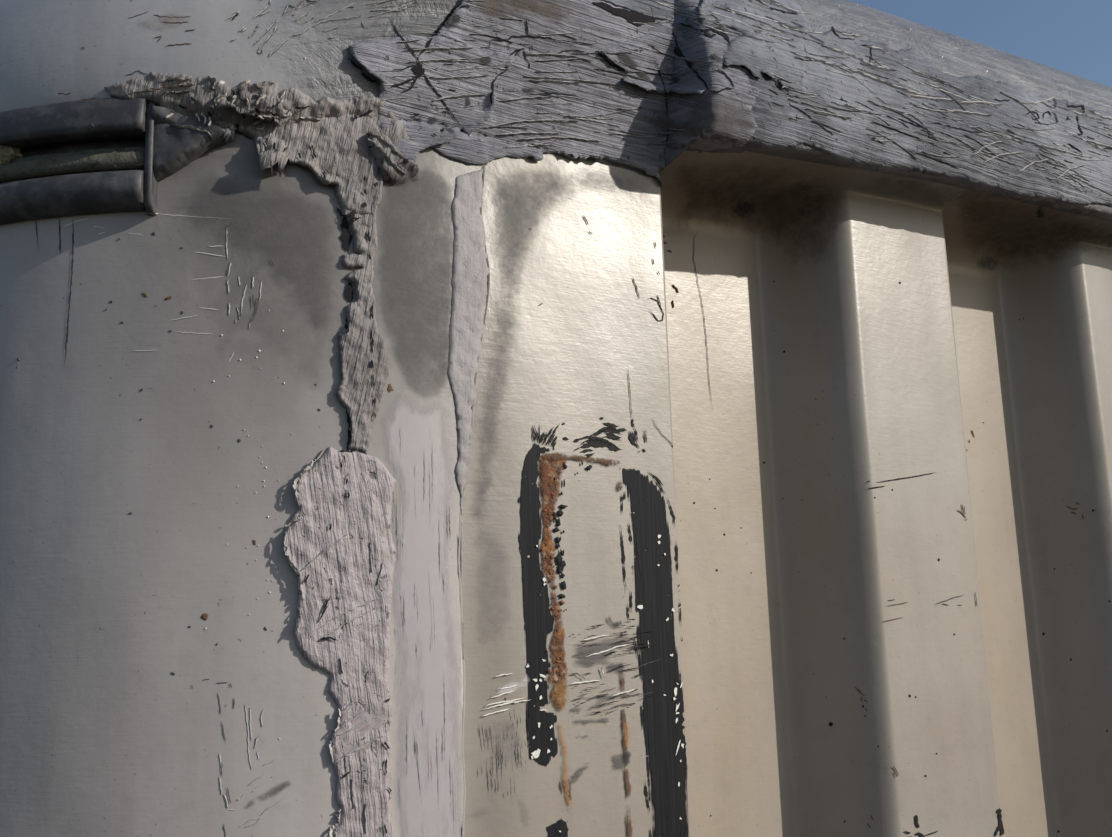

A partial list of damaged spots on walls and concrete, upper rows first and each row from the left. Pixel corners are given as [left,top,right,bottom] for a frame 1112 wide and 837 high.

crack [235,106,310,139]
crack [348,1,622,162]
peeling [601,28,707,95]
crack [604,0,788,166]
peeling [698,0,807,96]
rust [540,453,620,710]